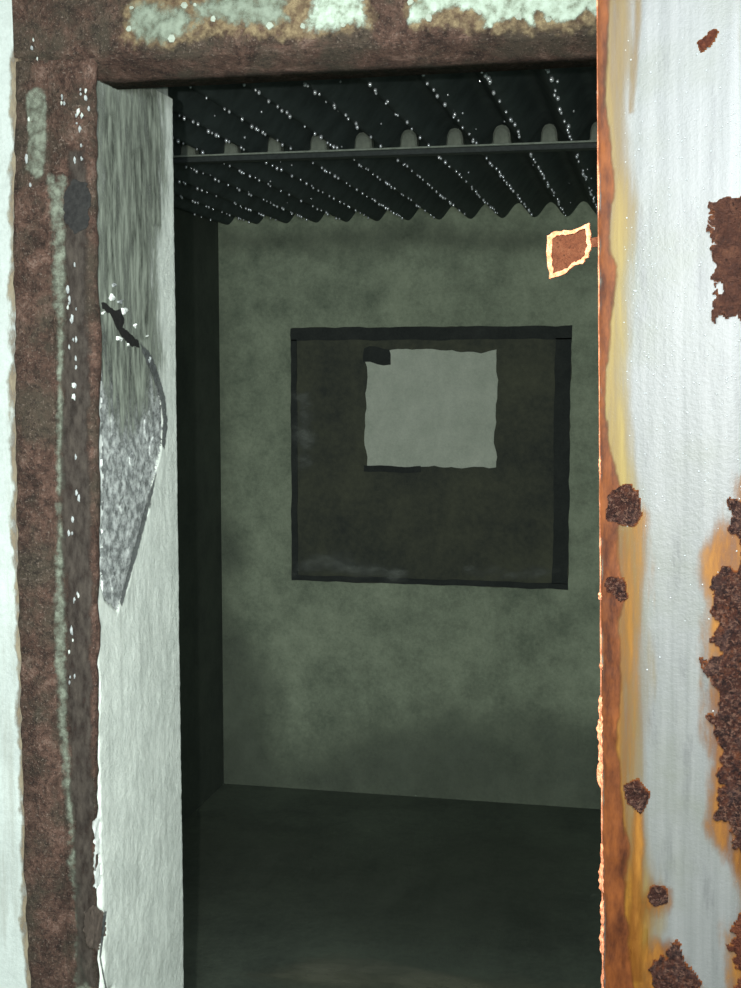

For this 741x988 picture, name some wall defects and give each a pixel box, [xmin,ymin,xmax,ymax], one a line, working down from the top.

peeling [124,0,371,48]
peeling [407,0,597,34]
rust [697,29,719,53]
rust [706,196,741,324]
rust [8,50,31,988]
spalling [99,283,168,610]
rust [546,0,702,988]
rust [699,485,741,880]
spalling [92,784,102,888]
rust [726,912,741,988]